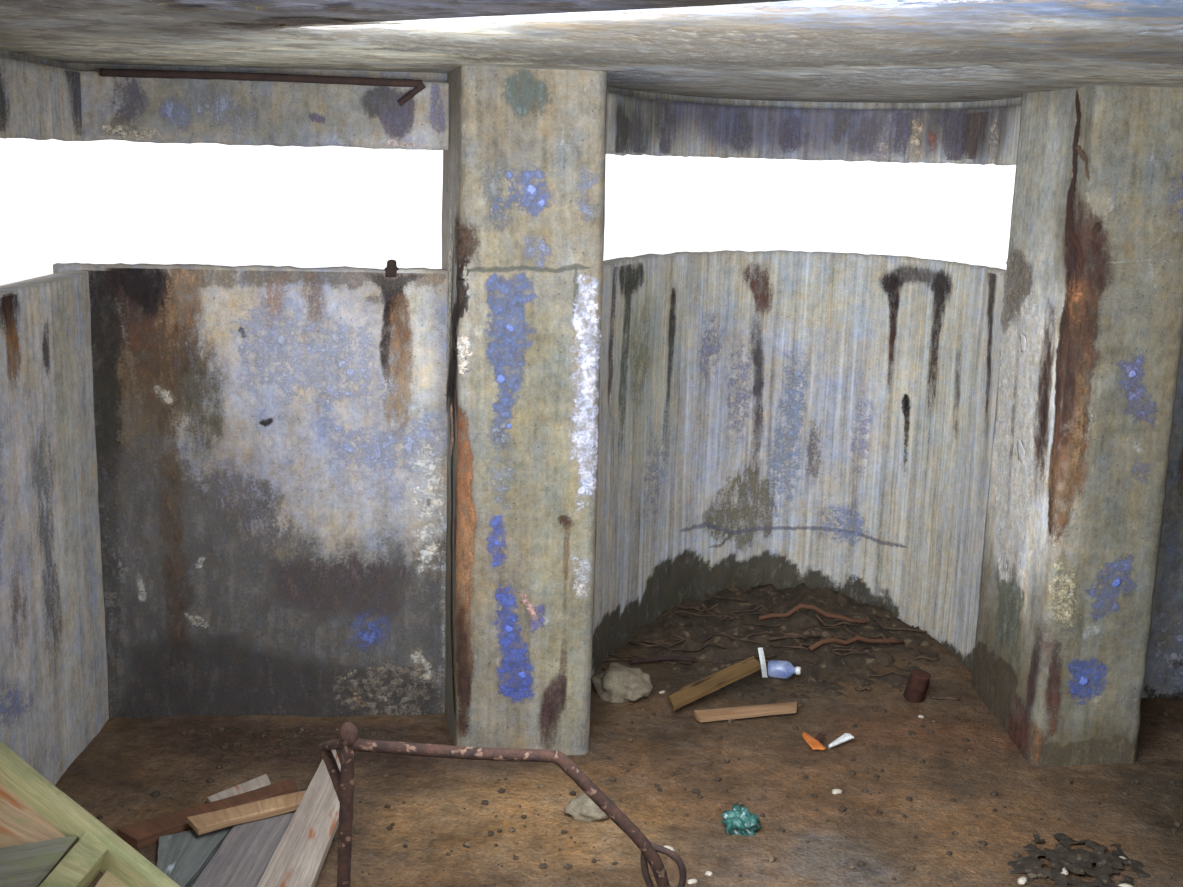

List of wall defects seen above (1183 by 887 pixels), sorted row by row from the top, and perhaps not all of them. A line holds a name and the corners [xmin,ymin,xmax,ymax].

damp [84,268,446,718]
rust [368,273,417,428]
rust [452,387,476,736]
rust [1035,194,1111,542]